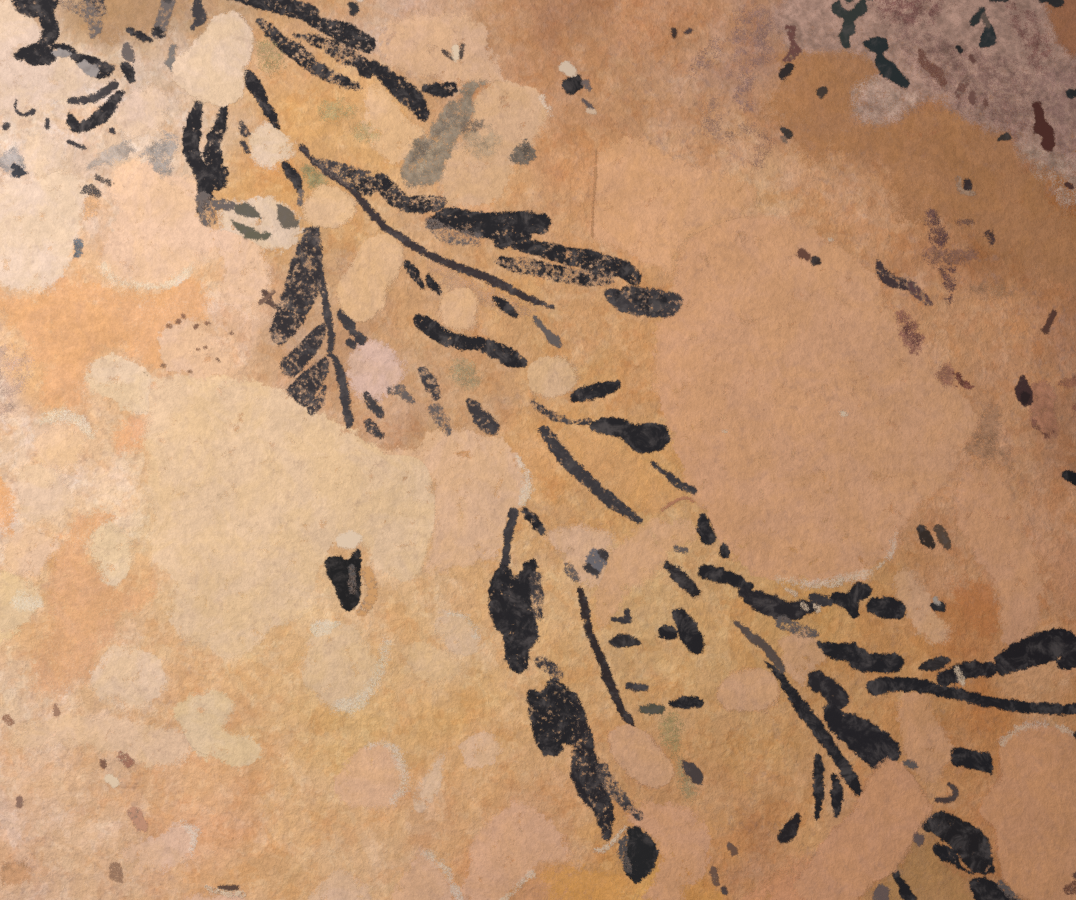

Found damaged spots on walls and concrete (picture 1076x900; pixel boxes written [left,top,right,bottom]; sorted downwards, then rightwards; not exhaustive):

flaking render [81,0,181,47]
peeling [166,312,210,329]
peeling [324,530,378,616]